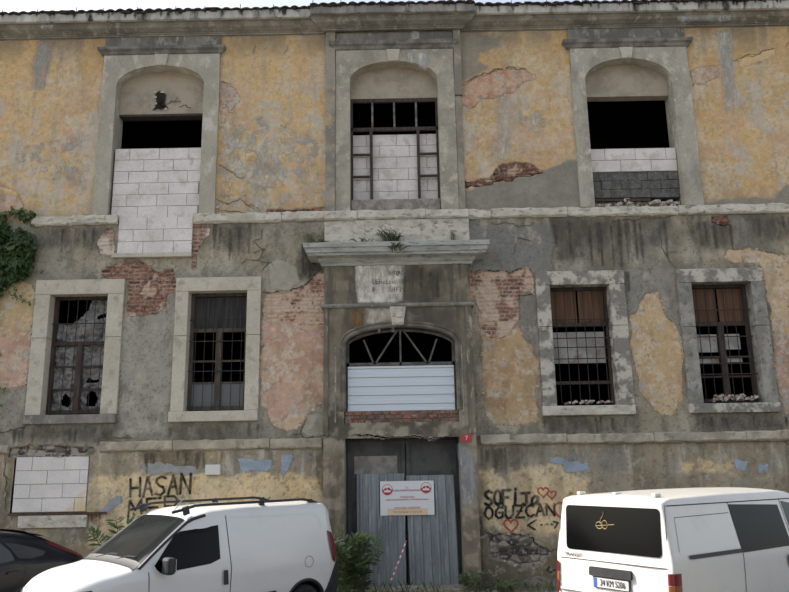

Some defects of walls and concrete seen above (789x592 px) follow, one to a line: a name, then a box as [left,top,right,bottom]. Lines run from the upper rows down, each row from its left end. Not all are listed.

spalling [465,163,543,187]
crack [217,198,259,212]
spalling [96,230,115,256]
spalling [191,224,210,269]
crack [242,231,272,270]
spalling [100,260,176,317]
crack [263,268,321,294]
peeling [259,272,324,431]
peeling [470,267,540,427]
peeling [629,292,684,416]
peeling [724,247,789,415]
spalling [480,533,551,568]